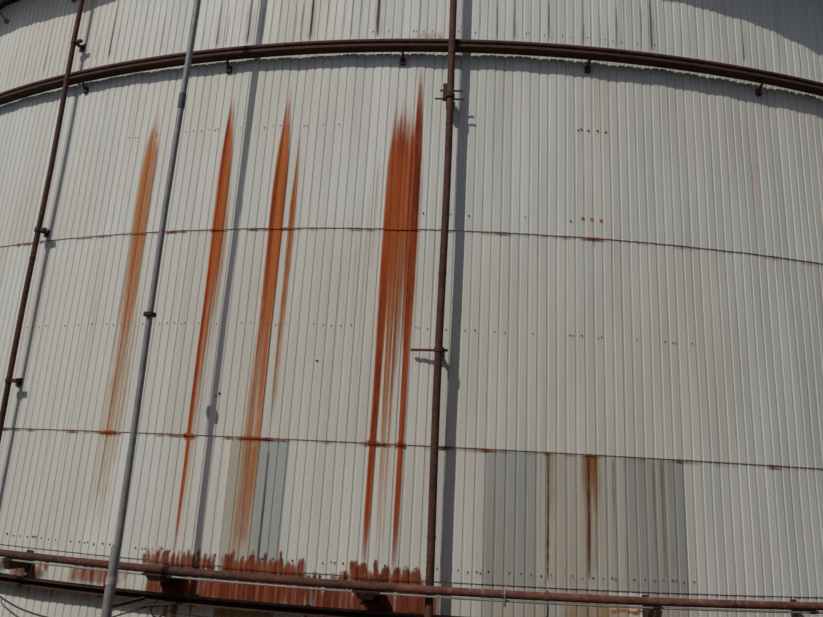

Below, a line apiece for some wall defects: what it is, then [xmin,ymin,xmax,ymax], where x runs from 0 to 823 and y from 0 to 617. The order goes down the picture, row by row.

rust [96,132,156,441]
rust [143,86,435,617]
rust [582,454,597,573]